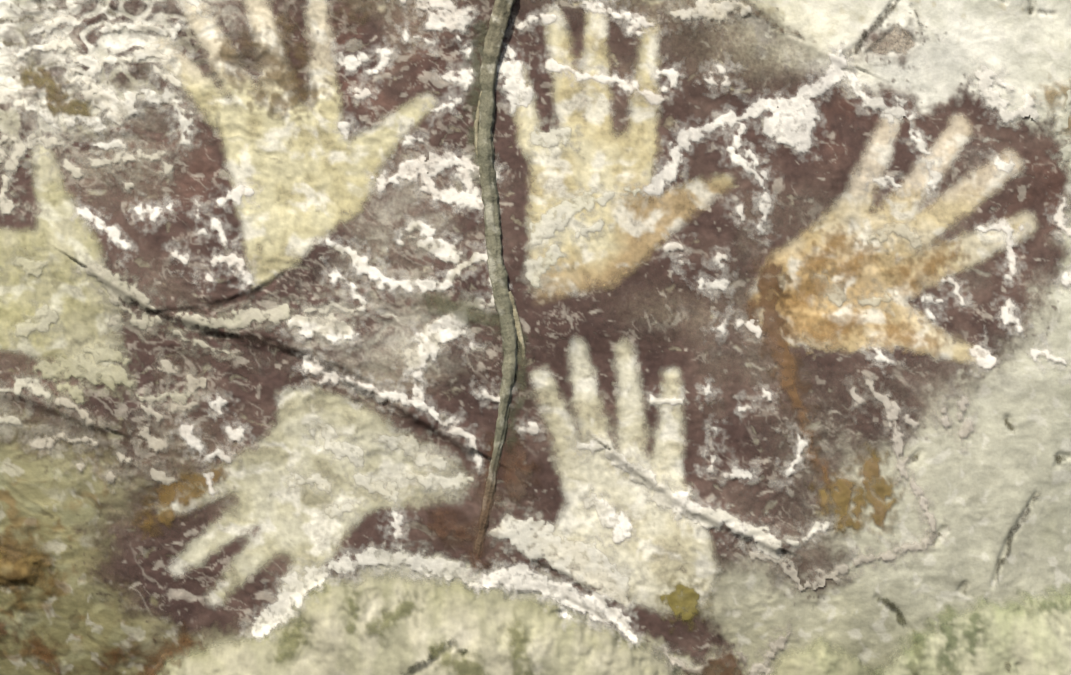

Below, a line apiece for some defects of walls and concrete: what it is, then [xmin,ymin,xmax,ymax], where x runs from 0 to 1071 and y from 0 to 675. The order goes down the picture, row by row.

crack [844,0,922,60]
leakage [0,0,504,637]
leakage [479,0,1071,598]
crack [996,496,1038,571]
leakage [276,622,306,661]
leakage [430,646,484,675]
leakage [509,629,531,675]
leakage [603,596,734,665]